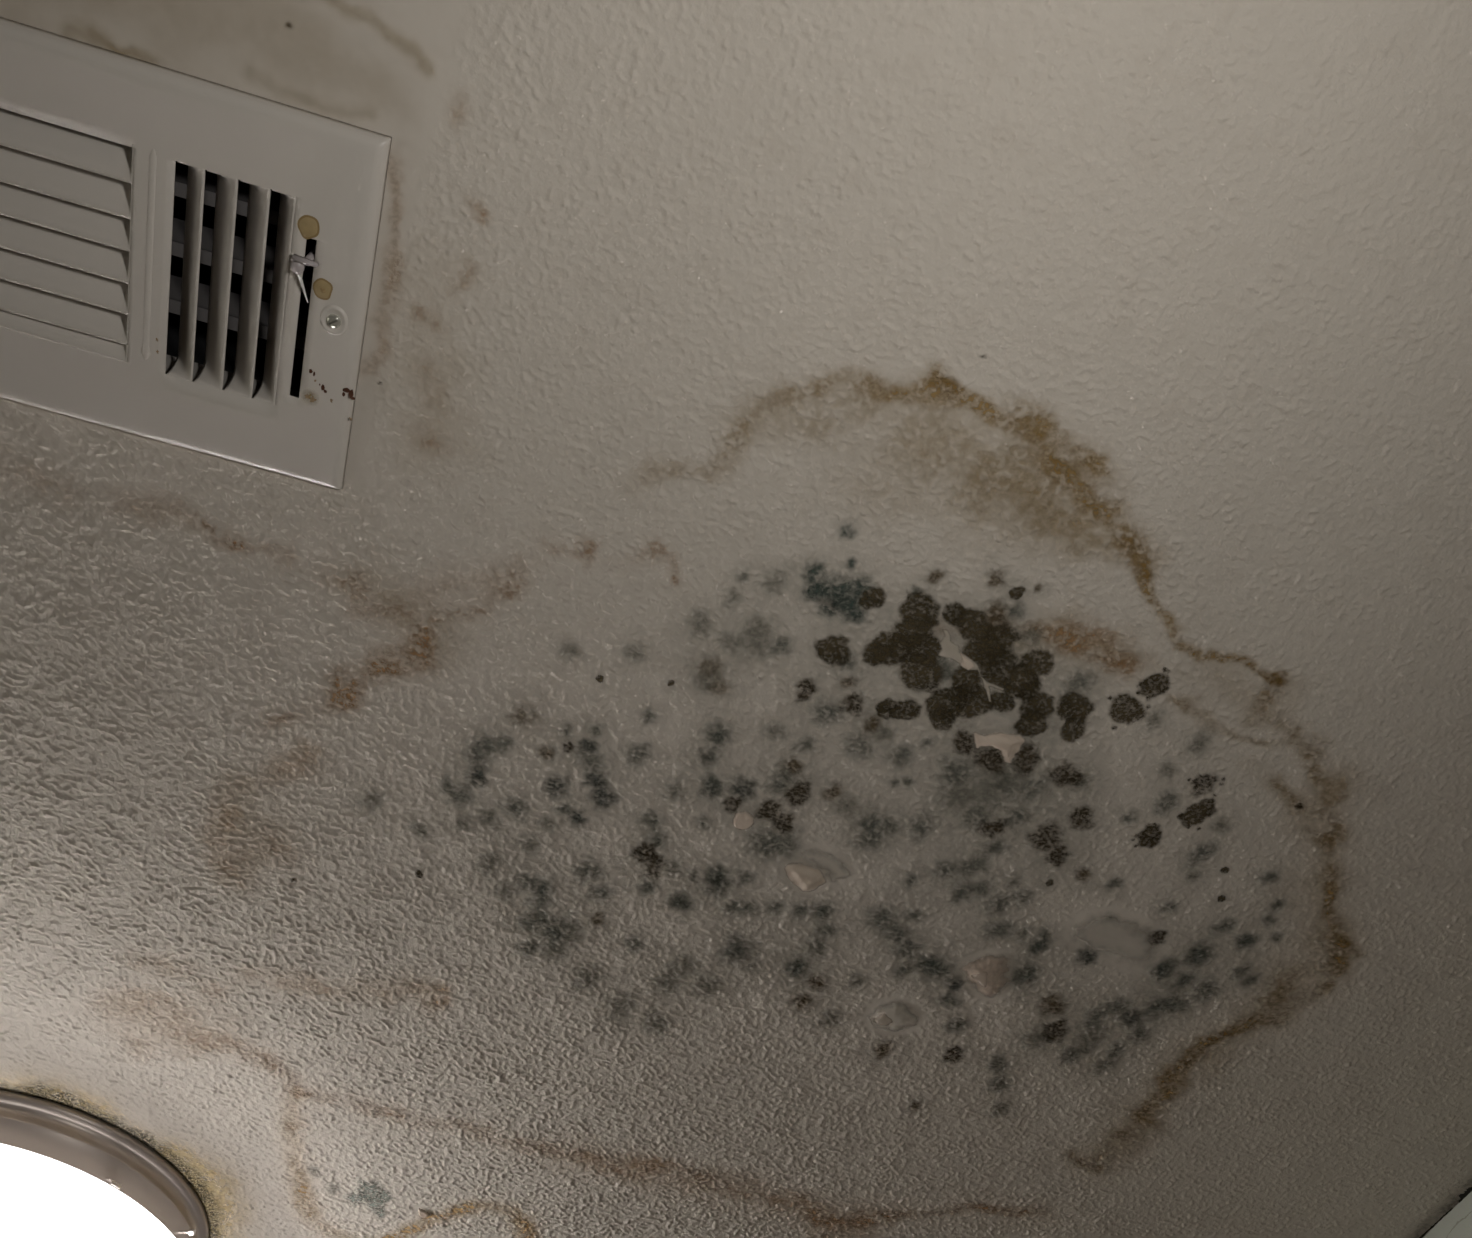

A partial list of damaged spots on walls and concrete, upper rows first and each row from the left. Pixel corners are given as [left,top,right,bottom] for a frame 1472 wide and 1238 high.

water stain [867,372,995,420]
water stain [988,415,1114,536]
water stain [1120,537,1282,684]
water stain [797,679,815,701]
water stain [807,560,1186,799]
water stain [542,728,614,806]
water stain [634,820,663,891]
water stain [710,742,810,852]
water stain [1029,807,1091,886]
water stain [1125,775,1225,848]
water stain [945,1046,961,1061]
water stain [1038,995,1065,1041]